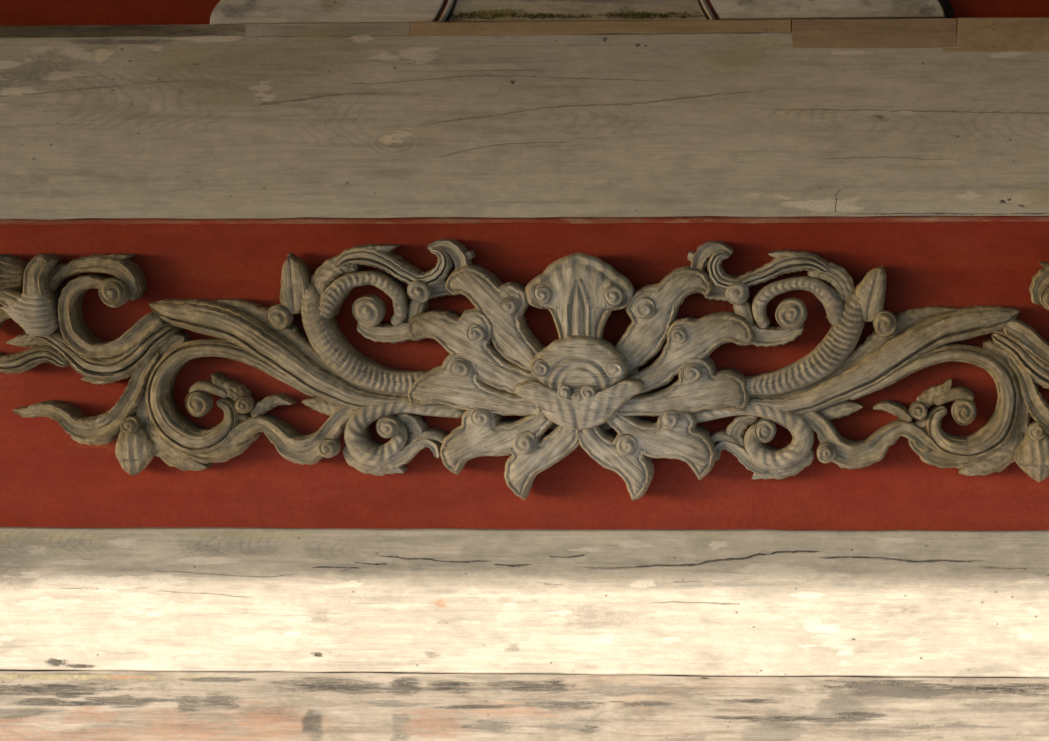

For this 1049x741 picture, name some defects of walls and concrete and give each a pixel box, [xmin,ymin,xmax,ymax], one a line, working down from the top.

crack [261,75,1049,125]
crack [60,550,1049,605]